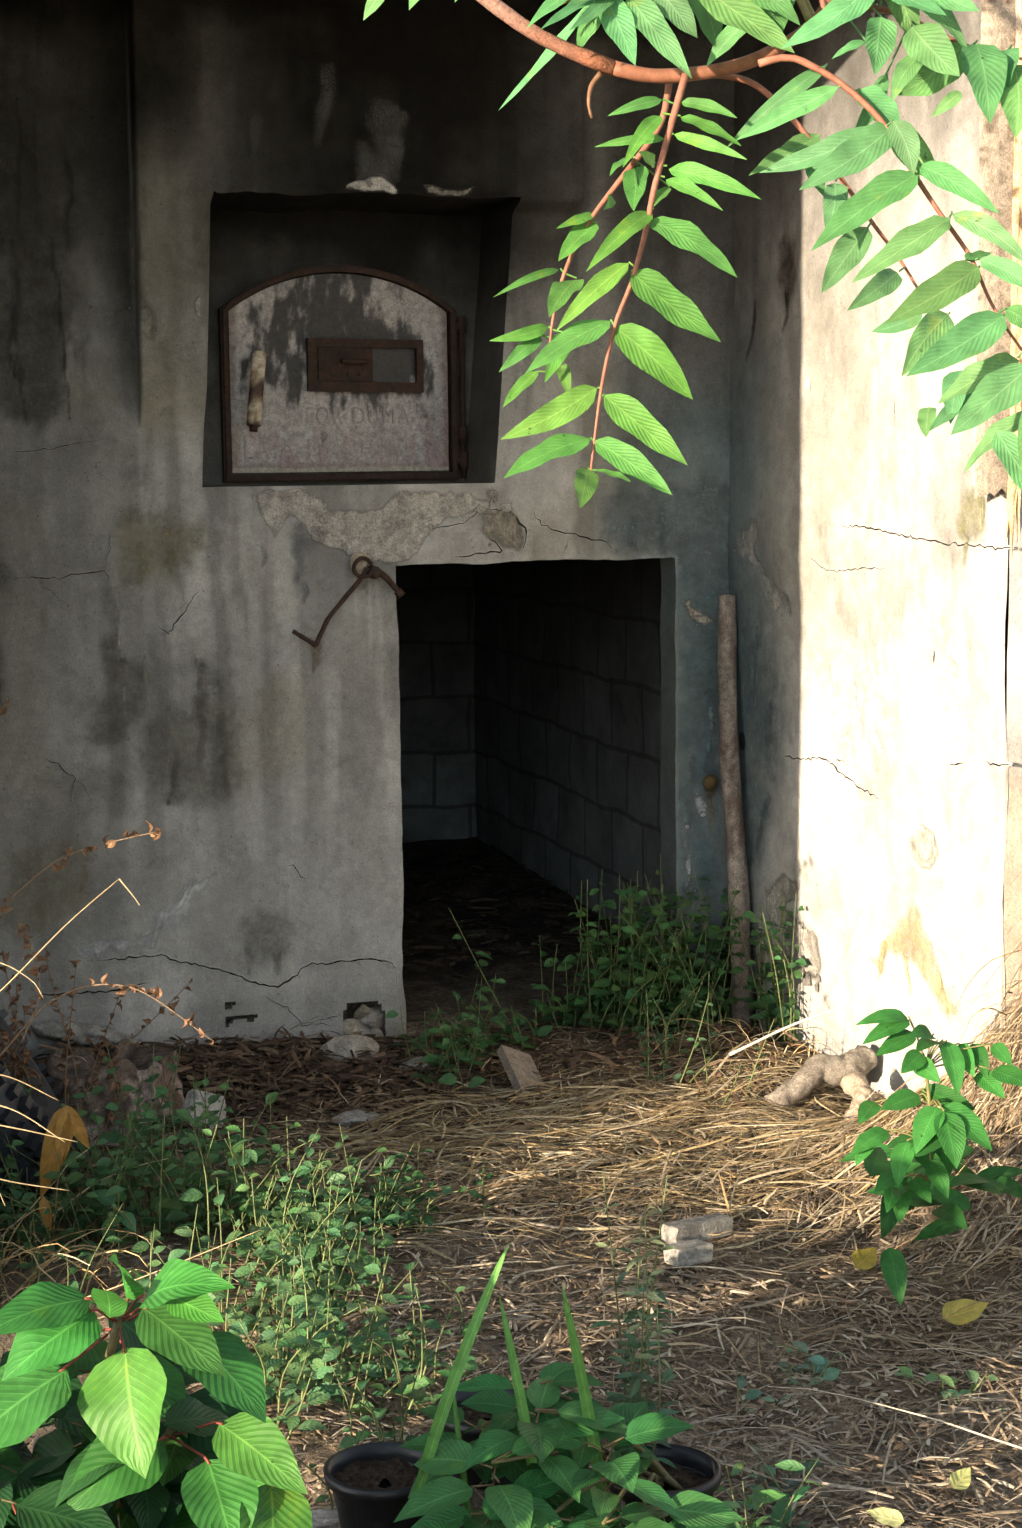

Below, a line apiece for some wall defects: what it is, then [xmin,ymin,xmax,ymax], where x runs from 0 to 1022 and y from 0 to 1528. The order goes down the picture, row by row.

damp [0,98,77,419]
spalling [257,488,512,563]
crack [810,523,1014,585]
damp [151,666,234,805]
crack [783,753,880,800]
crack [36,953,398,1027]